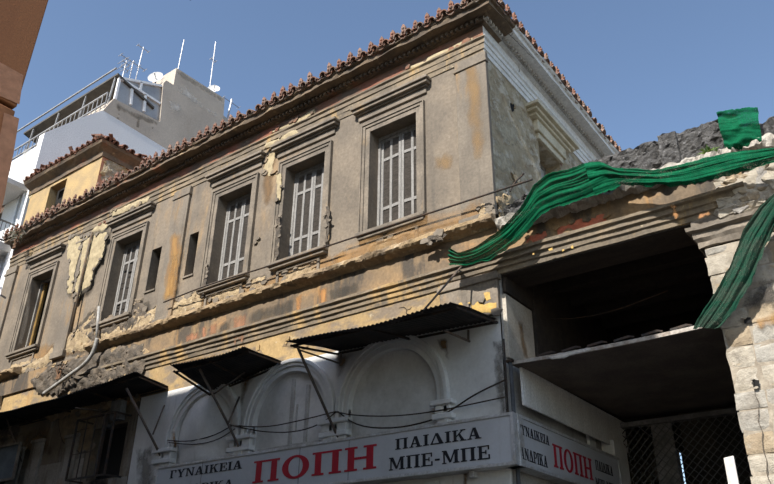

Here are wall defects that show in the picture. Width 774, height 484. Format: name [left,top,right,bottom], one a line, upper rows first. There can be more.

peeling [261,109,315,202]
peeling [65,197,149,303]
spalling [274,213,282,258]
peeling [524,213,611,245]
flaking render [172,263,267,315]
peeling [459,292,503,316]
flaking render [10,297,156,378]